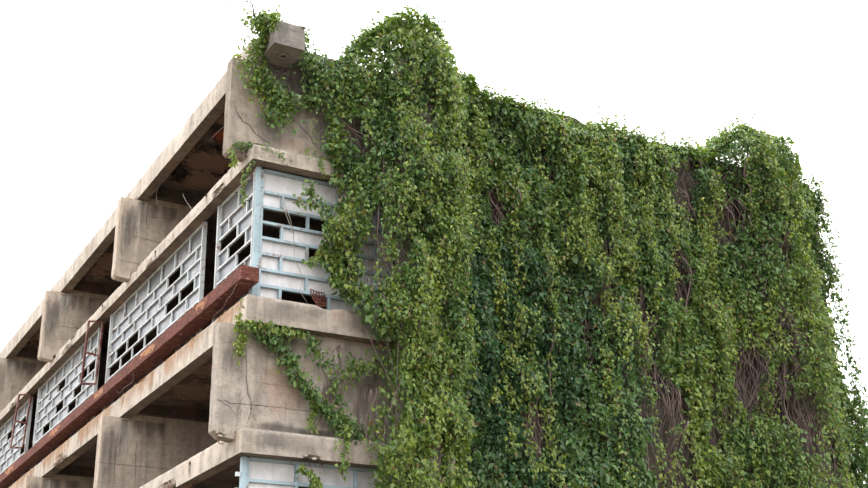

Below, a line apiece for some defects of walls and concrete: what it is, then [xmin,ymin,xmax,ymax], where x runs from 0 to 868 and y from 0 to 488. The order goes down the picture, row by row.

leakage [169,125,237,182]